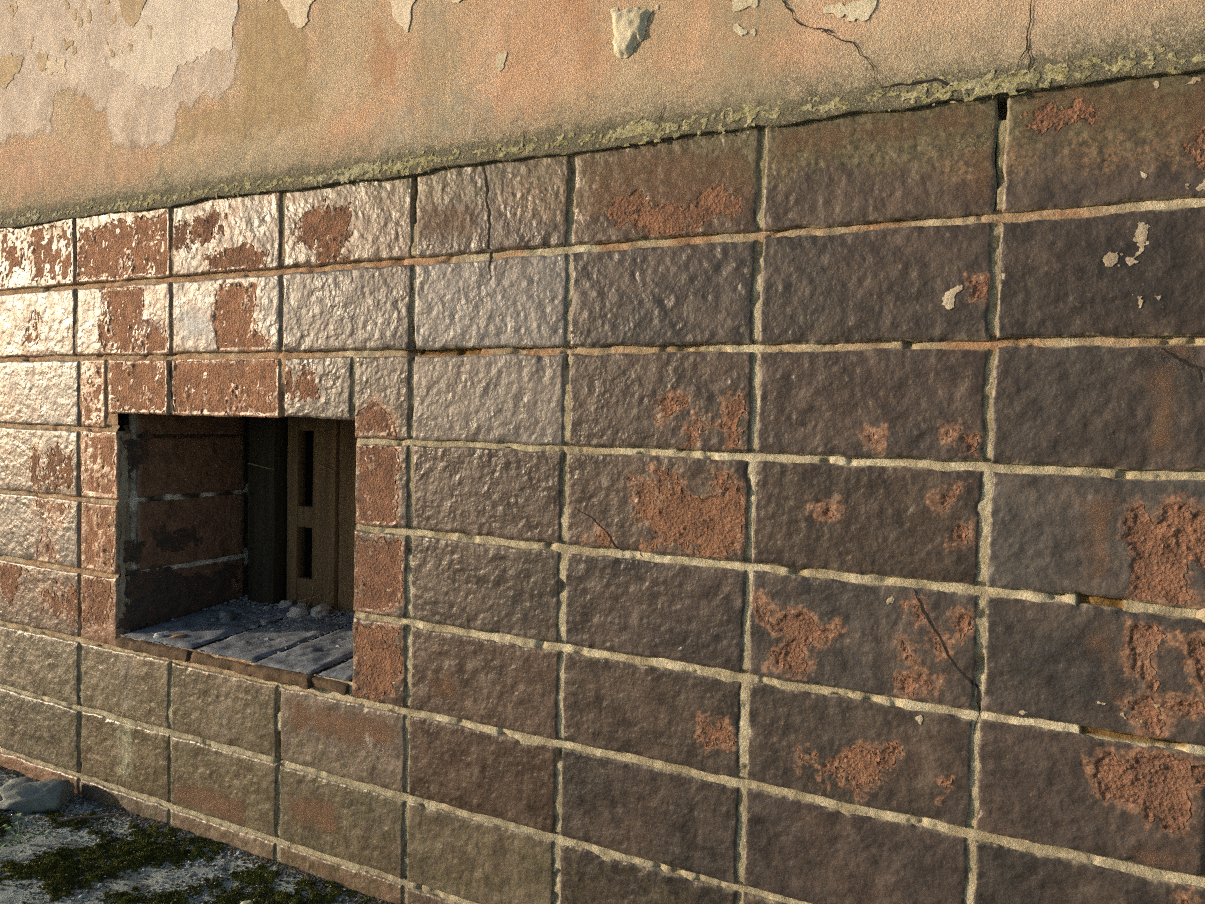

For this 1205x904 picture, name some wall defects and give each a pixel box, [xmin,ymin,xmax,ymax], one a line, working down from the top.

peeling [0,0,243,151]
water stain [179,0,311,140]
peeling [265,0,314,28]
peeling [389,0,415,33]
crack [782,0,956,91]
crack [1013,0,1032,75]
crack [482,164,492,278]
crack [1162,348,1205,382]
spalling [626,467,746,558]
spalling [1120,503,1205,604]
crack [913,588,981,735]
spalling [1090,623,1205,833]